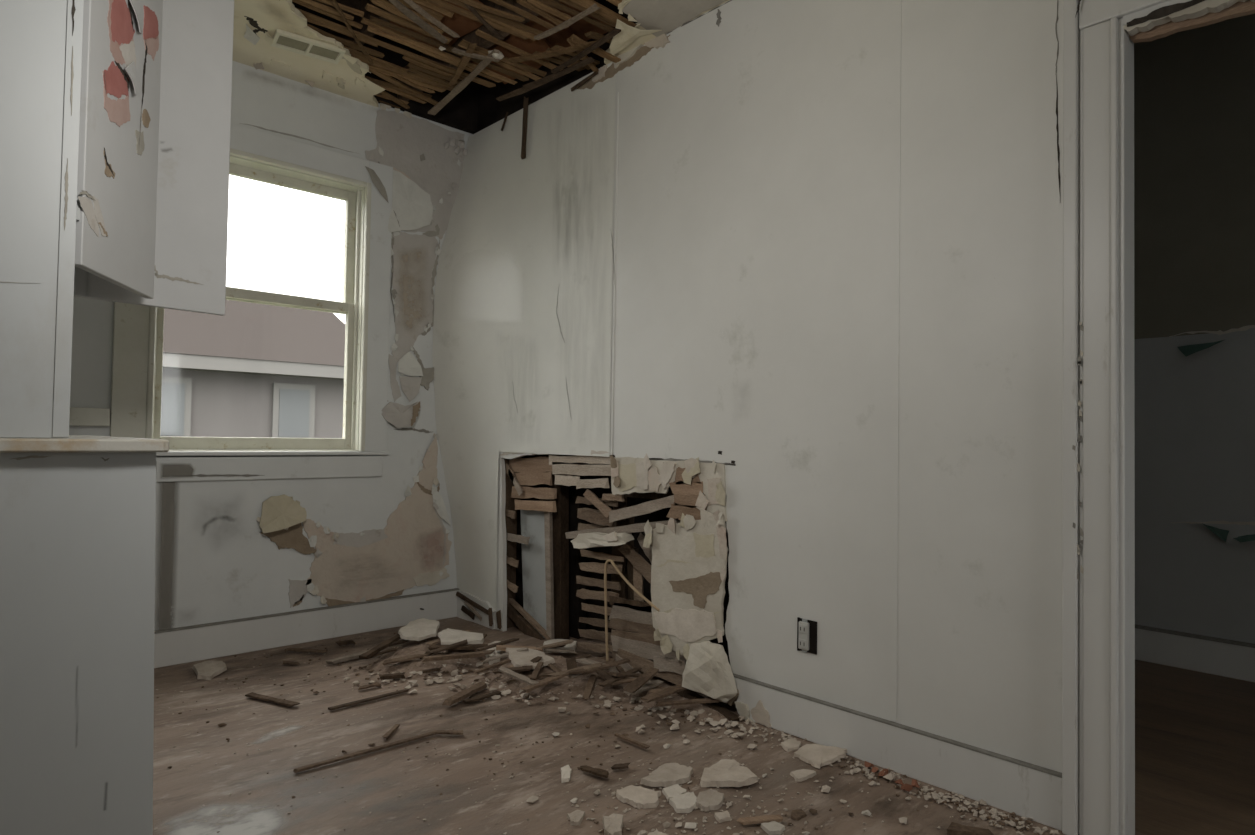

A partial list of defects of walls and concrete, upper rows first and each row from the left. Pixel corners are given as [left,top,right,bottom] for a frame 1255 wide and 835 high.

crack [1055,0,1081,192]
flaking render [1124,0,1255,43]
flaking render [288,103,468,608]
spalling [500,450,772,728]